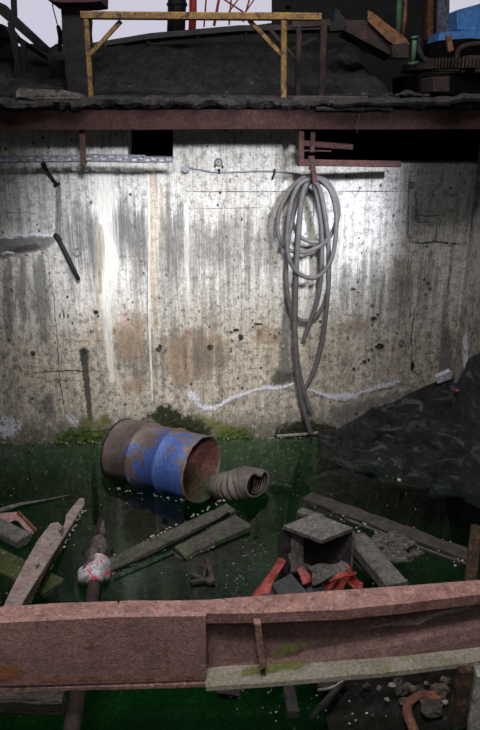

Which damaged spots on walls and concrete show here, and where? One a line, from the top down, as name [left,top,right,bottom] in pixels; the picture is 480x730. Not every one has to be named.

damp [91,162,121,383]
crack [408,226,464,371]
damp [0,416,24,439]
damp [79,347,92,421]
damp [186,299,296,411]